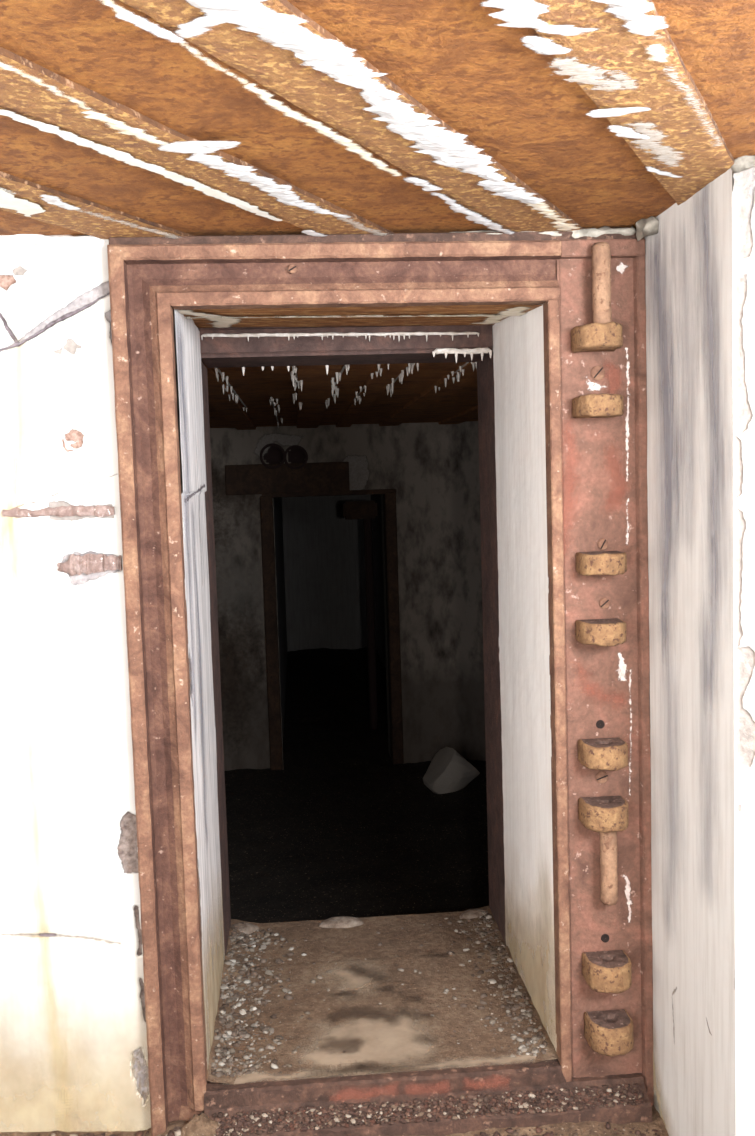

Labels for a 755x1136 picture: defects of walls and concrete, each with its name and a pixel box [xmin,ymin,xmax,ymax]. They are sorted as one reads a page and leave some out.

peeling [733,167,755,259]
rust [0,275,16,290]
crack [0,281,110,352]
rust [62,429,84,452]
peeling [733,274,755,768]
spalling [62,551,120,586]
spalling [117,812,138,873]
crack [3,933,120,944]
spalling [132,1048,149,1104]